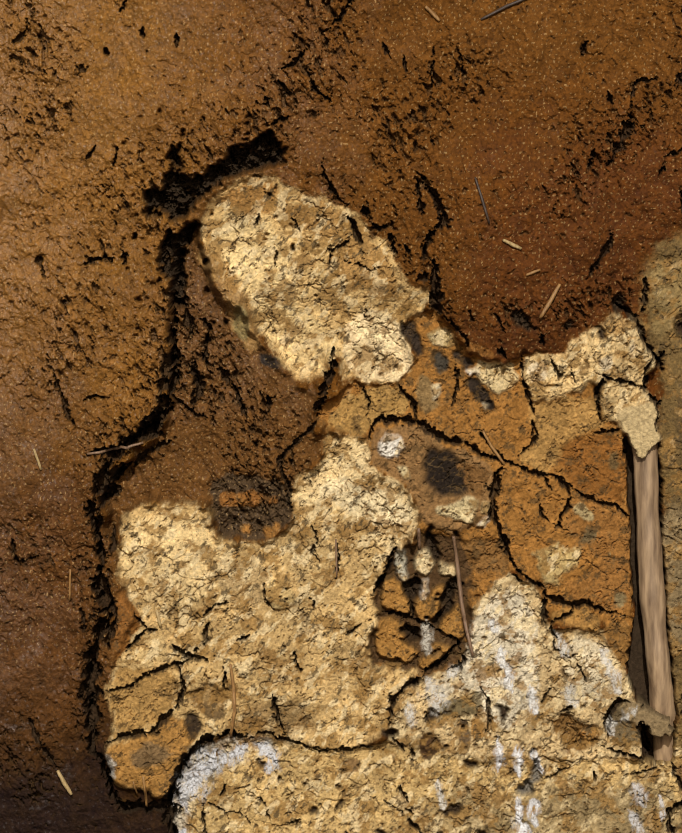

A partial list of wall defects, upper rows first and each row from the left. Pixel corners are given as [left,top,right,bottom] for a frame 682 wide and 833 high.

crack [539,276,665,435]
crack [320,165,630,682]
spalling [103,129,682,833]
crack [78,302,468,833]
crack [481,687,492,730]
water stain [496,647,514,693]
water stain [528,686,538,714]
crack [541,688,573,713]
water stain [179,742,278,807]
water stain [513,747,544,777]
crack [603,697,682,833]
water stain [515,798,539,833]